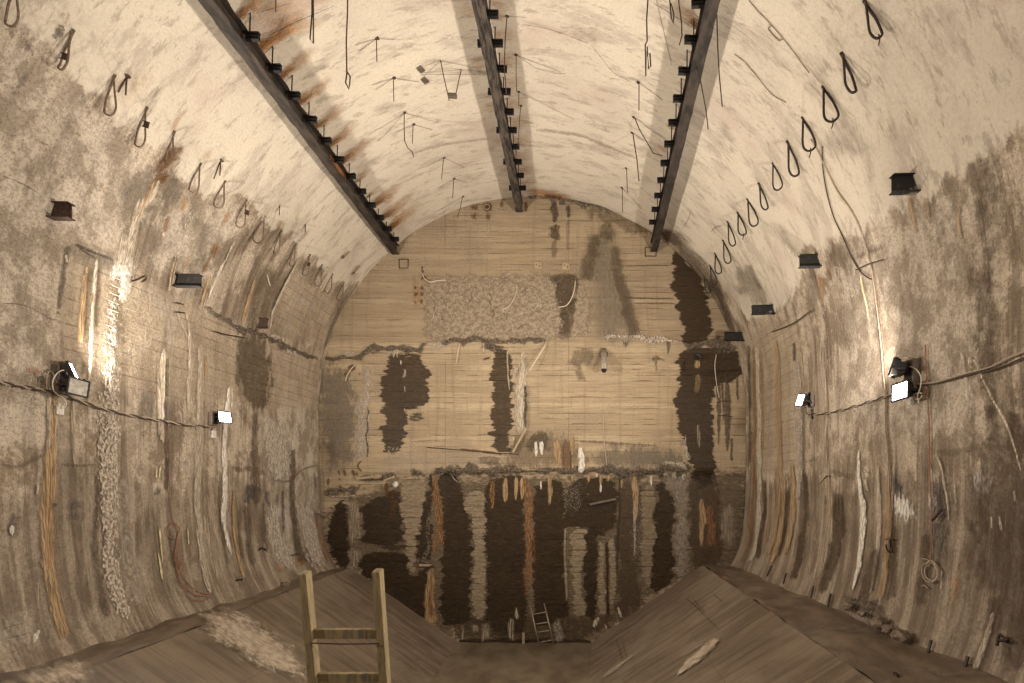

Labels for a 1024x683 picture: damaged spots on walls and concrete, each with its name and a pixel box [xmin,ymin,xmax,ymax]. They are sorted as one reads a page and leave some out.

rust [258,21,298,50]
rust [330,131,356,180]
rust [367,193,406,230]
leakage [230,263,296,410]
spalling [422,272,591,352]
leakage [320,231,746,643]